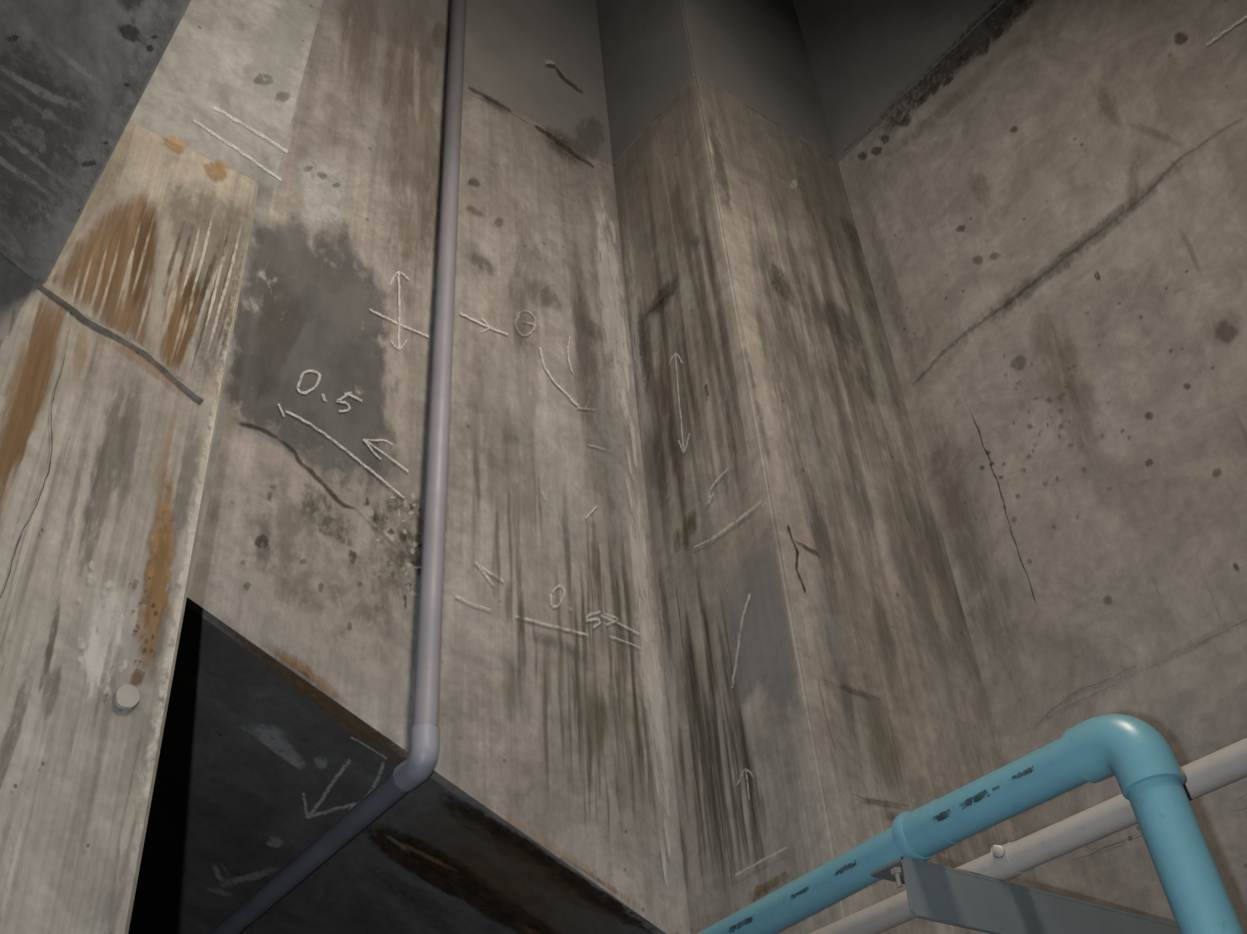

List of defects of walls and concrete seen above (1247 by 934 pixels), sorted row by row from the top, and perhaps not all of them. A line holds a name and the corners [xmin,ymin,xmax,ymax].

mould [887,0,1032,124]
rust [0,301,63,515]
crack [0,329,70,598]
rust [53,197,157,340]
rust [131,484,175,685]
rust [162,269,200,367]
crack [238,422,357,509]
water stain [597,198,687,877]
crack [787,524,820,593]
crack [970,411,1036,602]